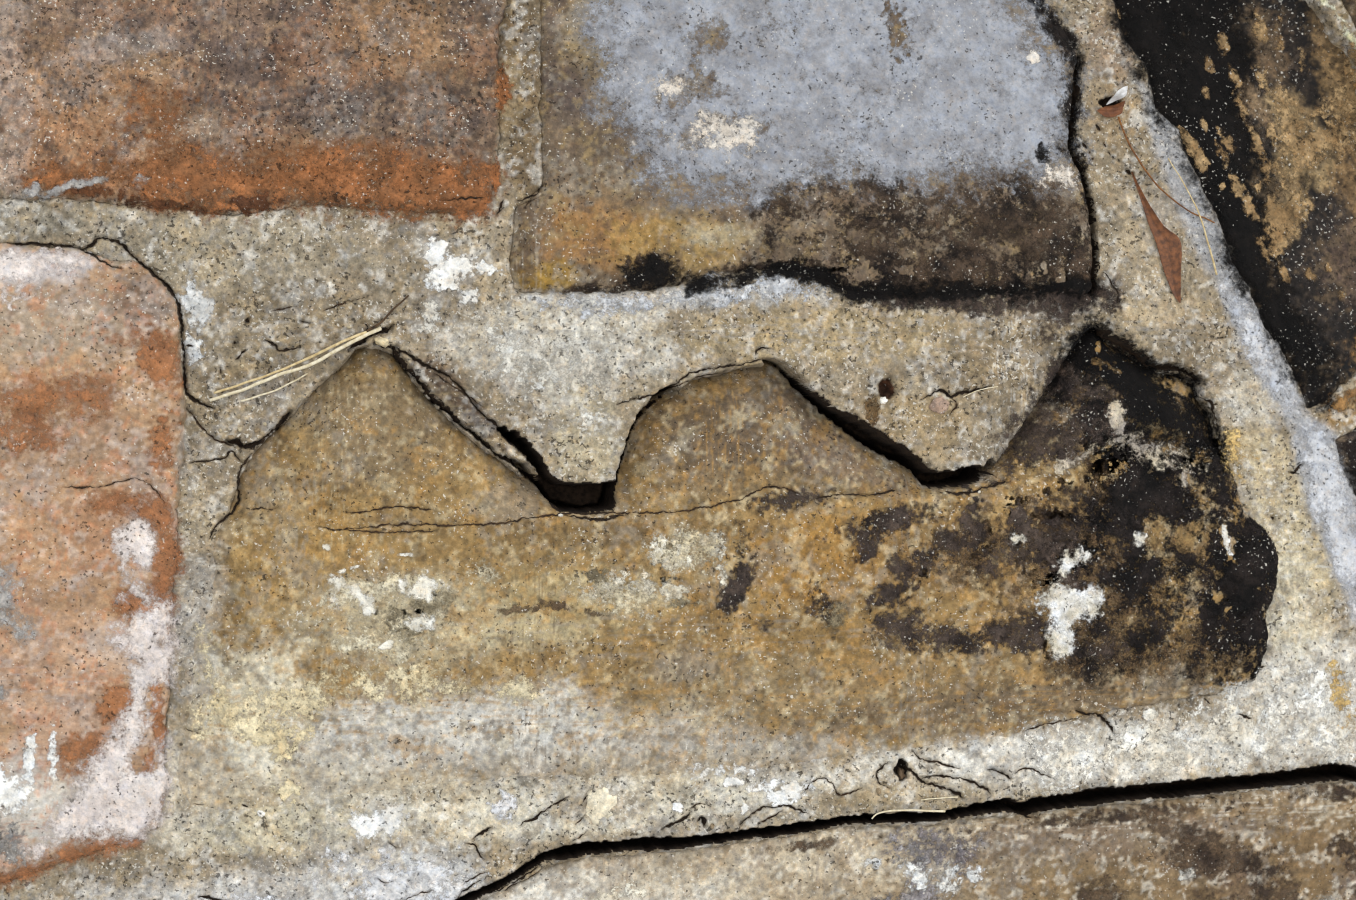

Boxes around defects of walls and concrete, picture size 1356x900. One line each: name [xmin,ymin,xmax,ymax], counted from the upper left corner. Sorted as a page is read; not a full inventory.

spalling [864,379,894,428]
efflorescence [1219,276,1303,411]
efflorescence [1300,421,1356,619]
damp [927,463,1356,796]
crack [377,751,1356,900]